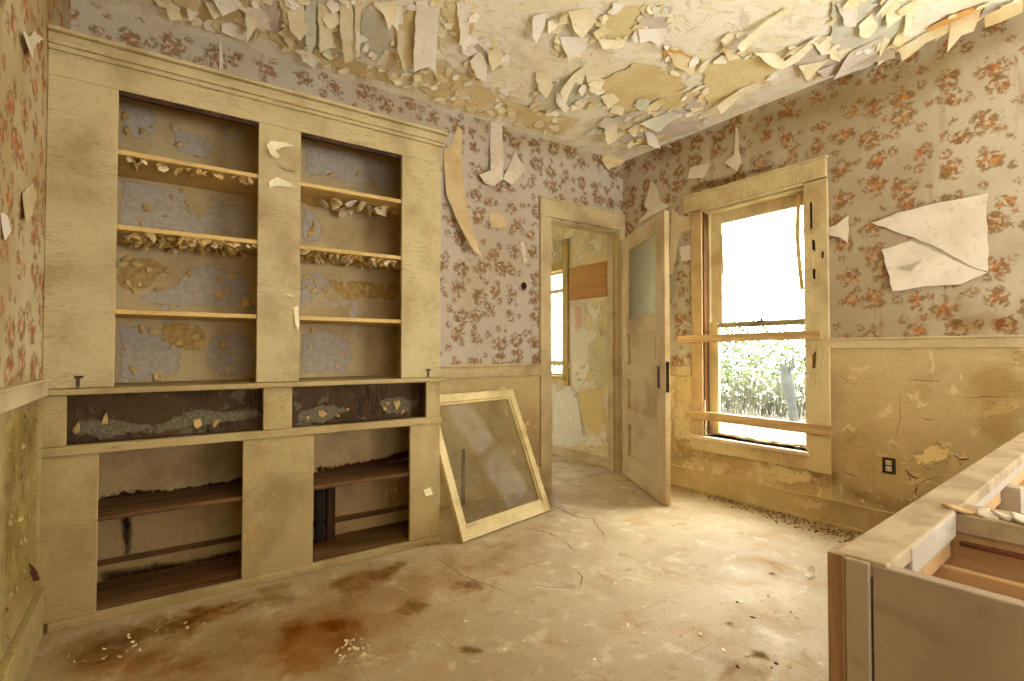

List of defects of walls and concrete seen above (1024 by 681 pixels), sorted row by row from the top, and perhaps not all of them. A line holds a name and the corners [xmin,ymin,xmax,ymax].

peeling [926,0,1018,41]
peeling [155,0,919,151]
peeling [121,99,156,139]
peeling [267,139,398,191]
peeling [116,124,257,310]
peeling [285,197,400,374]
peeling [118,322,256,382]
peeling [552,302,601,448]
peeling [72,406,259,440]
crack [905,469,934,495]
spalling [913,441,954,469]
crack [443,505,605,598]